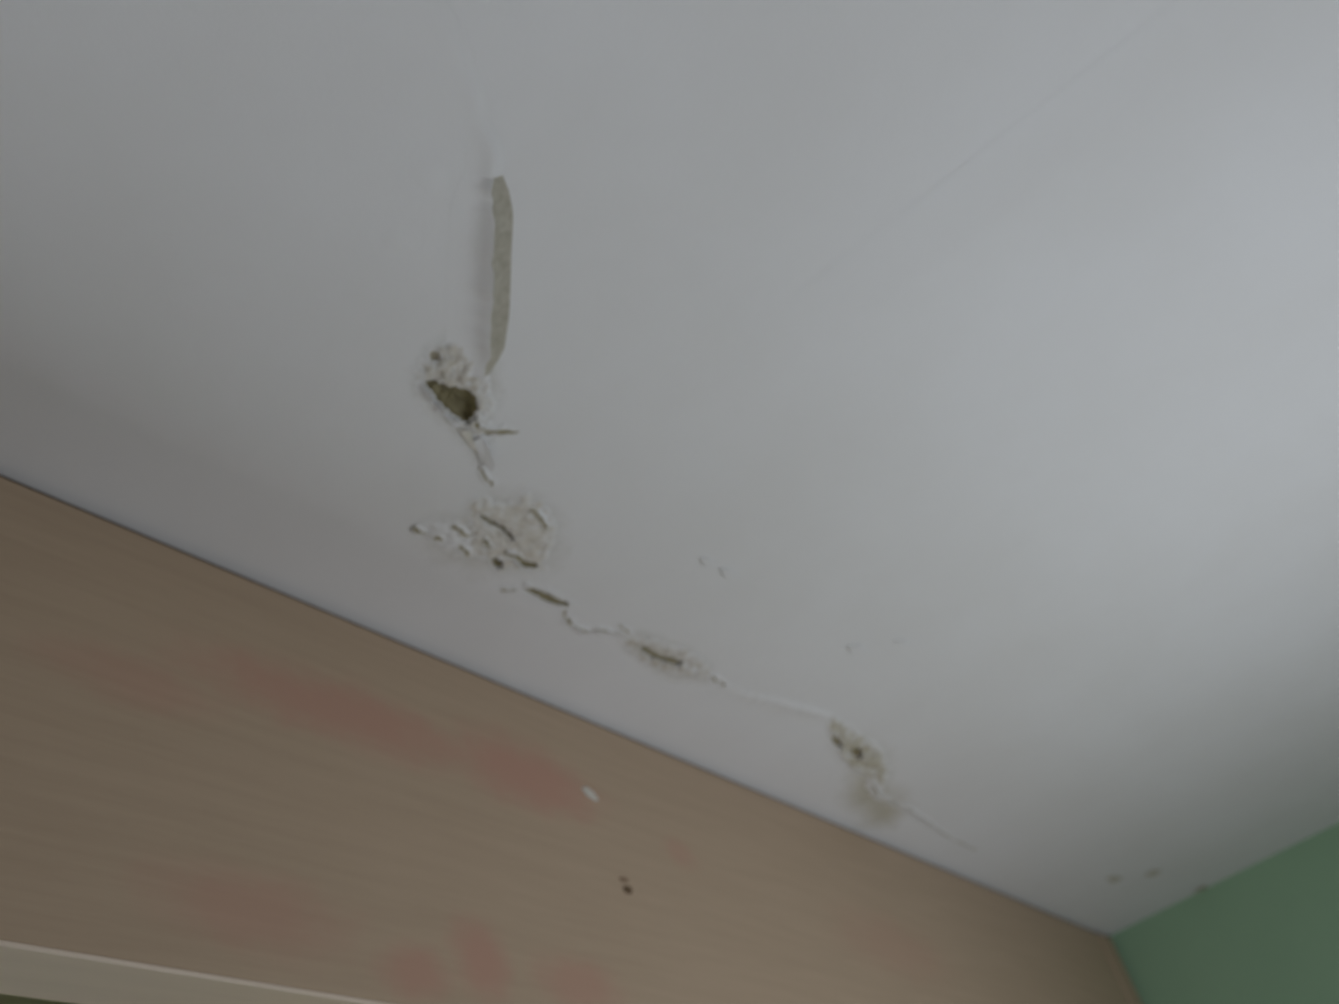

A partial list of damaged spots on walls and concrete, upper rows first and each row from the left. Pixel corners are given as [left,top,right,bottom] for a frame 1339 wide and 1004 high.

flaking render [407,171,560,578]
crack [500,581,837,728]